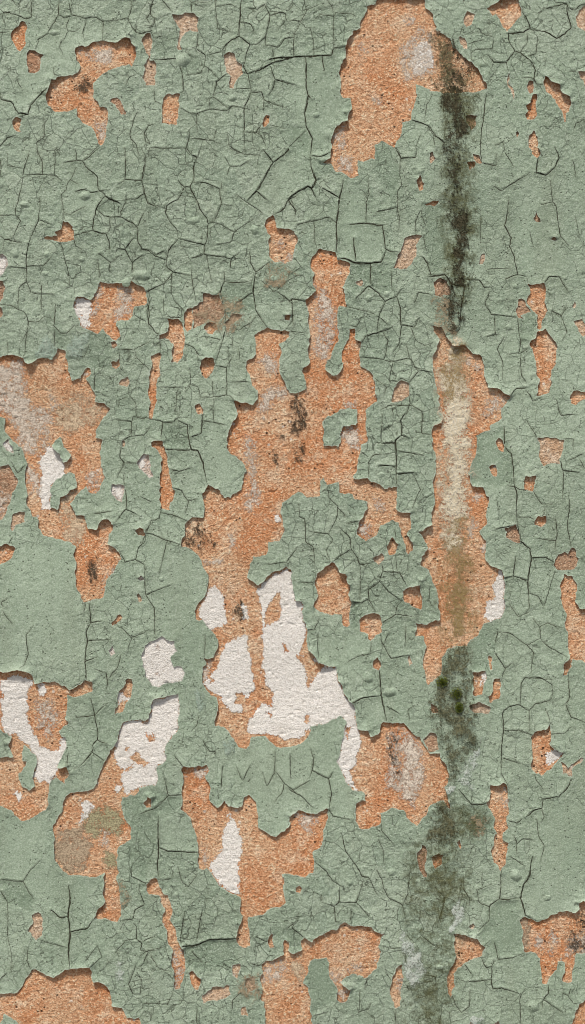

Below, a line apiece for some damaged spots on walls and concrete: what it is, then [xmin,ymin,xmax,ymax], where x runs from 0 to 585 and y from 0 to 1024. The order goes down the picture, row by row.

peeling [323,0,487,178]
peeling [0,348,125,602]
crack [0,0,580,765]
peeling [181,249,511,829]
damp [429,33,477,641]
peeling [0,636,185,922]
crack [1,757,267,1005]
crack [195,717,410,922]
efflorescence [400,932,424,986]
damp [426,741,487,843]
efflorescence [449,902,465,933]
crack [359,429,584,1024]